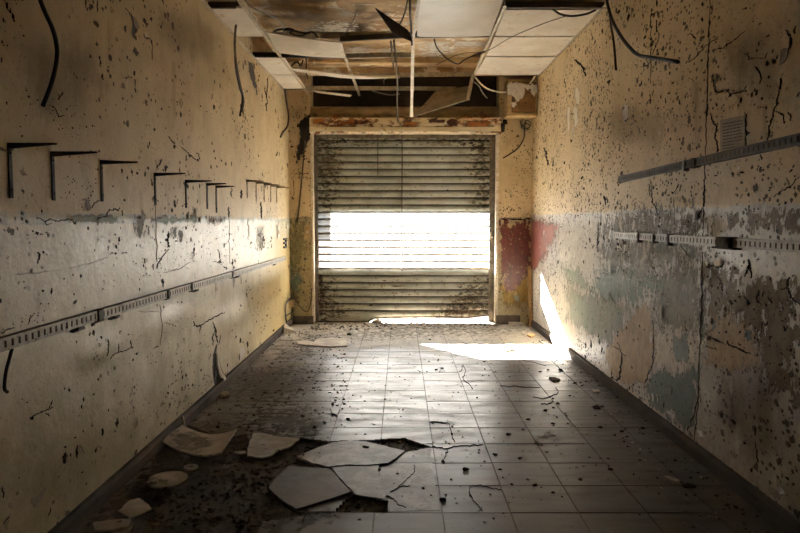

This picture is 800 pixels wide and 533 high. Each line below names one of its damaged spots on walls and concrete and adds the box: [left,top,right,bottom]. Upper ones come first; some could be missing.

peeling [310,20,358,32]
peeling [345,44,398,53]
peeling [416,42,485,57]
peeling [243,60,260,92]
peeling [506,81,548,107]
rust [312,114,503,217]
crack [686,0,800,440]
peeling [498,86,800,418]
crack [107,307,225,364]
crack [430,421,483,463]
crack [387,465,415,508]